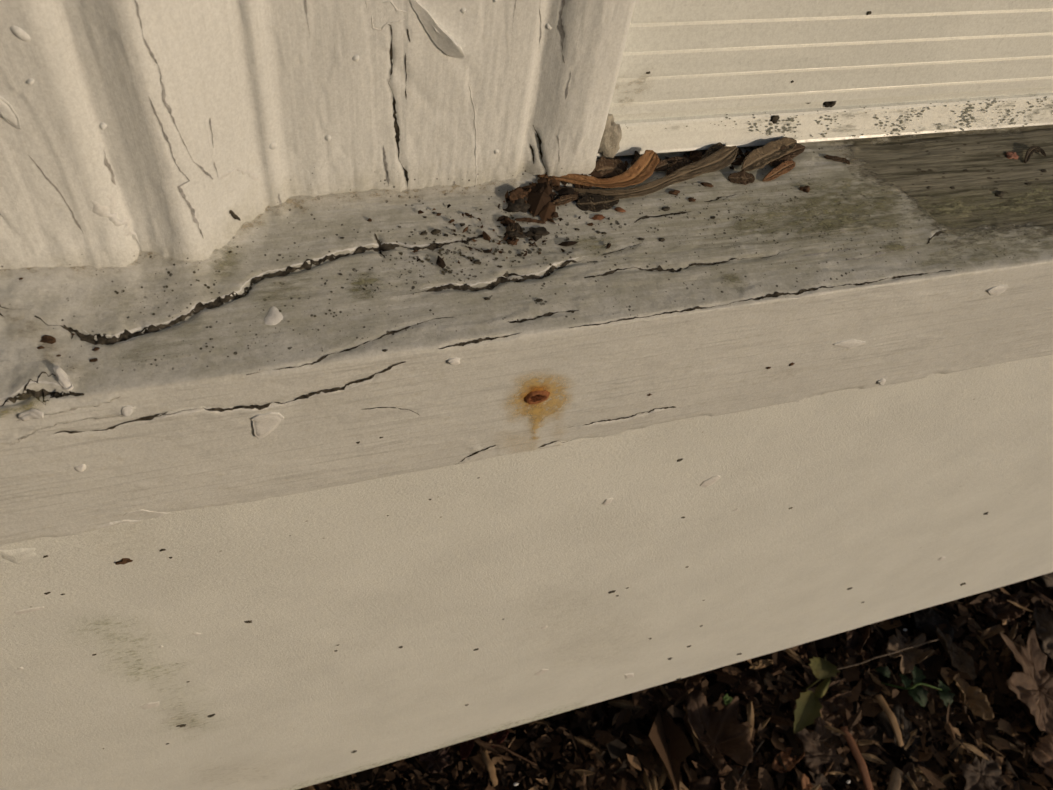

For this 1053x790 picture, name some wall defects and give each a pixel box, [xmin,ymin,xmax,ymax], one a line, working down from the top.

crack [383,24,410,190]
crack [28,155,84,234]
crack [104,151,116,185]
crack [530,125,560,174]
crack [411,194,881,294]
peeling [845,125,1053,247]
crack [927,224,1019,244]
crack [0,234,483,345]
crack [247,317,453,375]
crack [440,270,951,349]
crack [50,361,420,435]
corrosion [513,378,565,439]